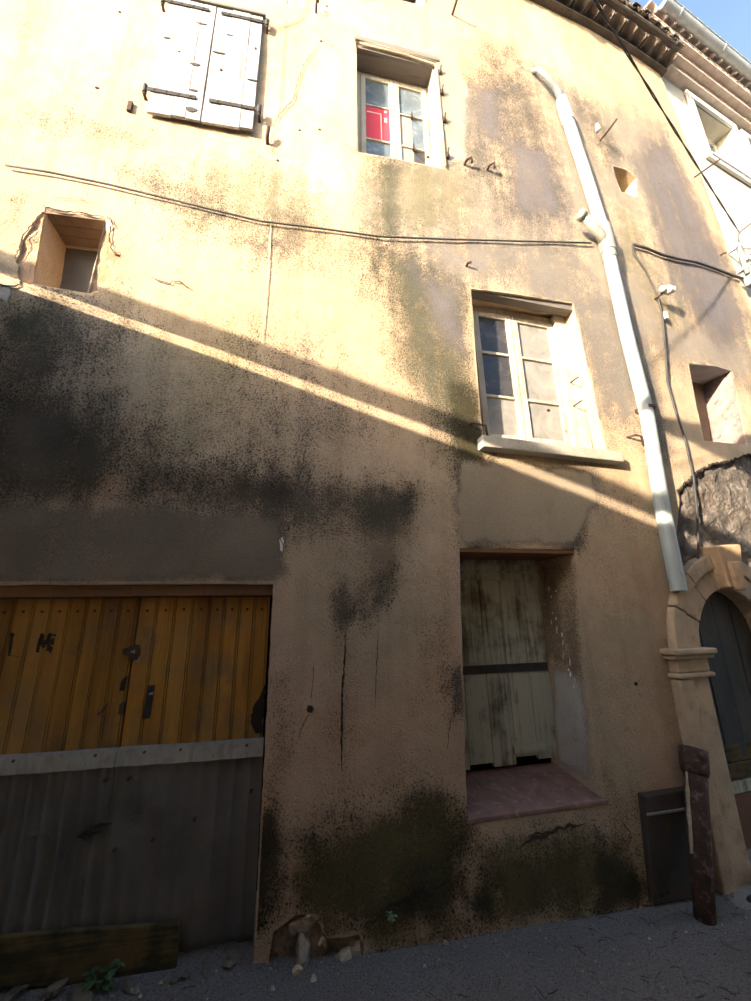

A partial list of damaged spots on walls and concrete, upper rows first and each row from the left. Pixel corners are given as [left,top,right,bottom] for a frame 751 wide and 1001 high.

crack [263,25,320,155]
spalling [0,214,44,303]
spalling [90,219,121,293]
damp [0,36,751,644]
damp [540,522,593,780]
spalling [269,914,363,970]